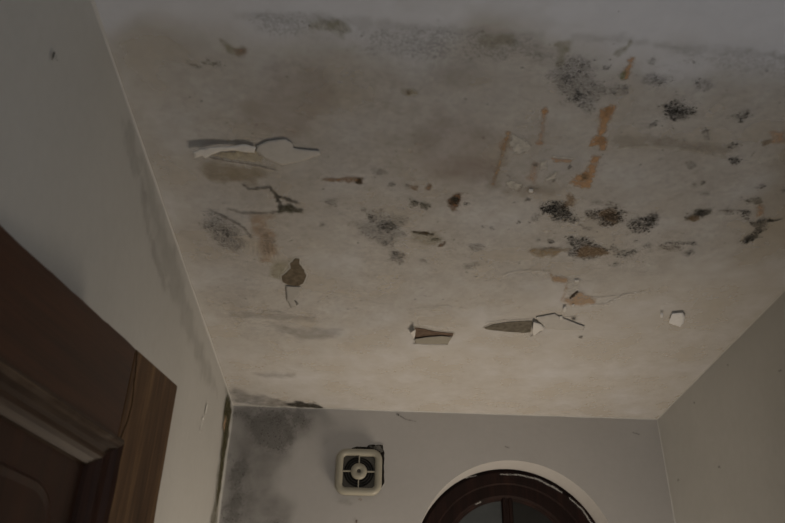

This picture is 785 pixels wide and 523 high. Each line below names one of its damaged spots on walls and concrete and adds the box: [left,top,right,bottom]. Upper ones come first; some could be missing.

peeling [193,139,320,170]
rust [572,106,615,188]
crack [248,187,301,213]
water stain [542,195,574,218]
spalling [280,257,308,308]
spalling [410,326,455,344]
spalling [482,277,594,338]
peeling [660,313,685,327]
water stain [212,397,232,523]